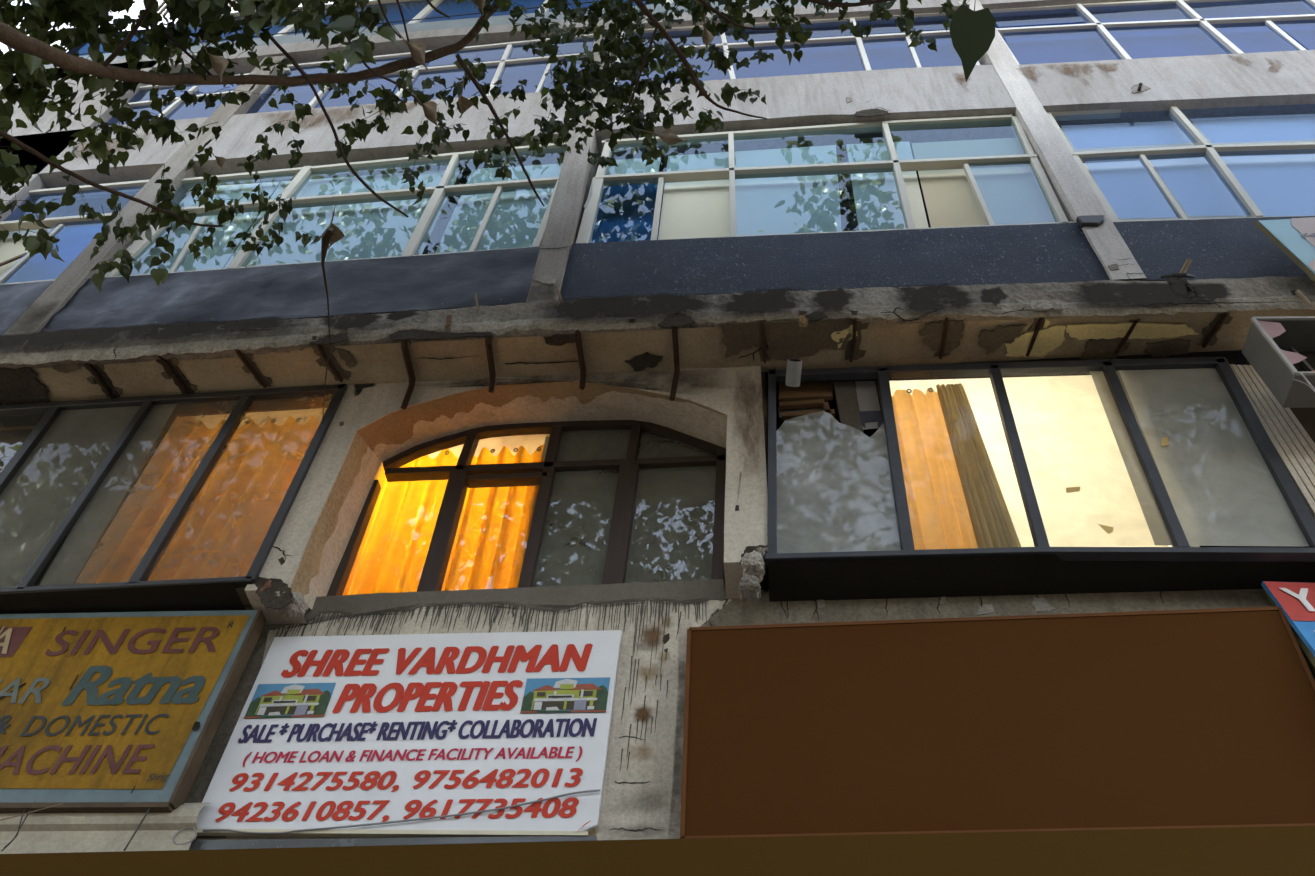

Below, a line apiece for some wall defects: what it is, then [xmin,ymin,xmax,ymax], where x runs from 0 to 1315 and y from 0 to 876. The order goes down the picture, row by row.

spalling [309,332,356,382]
spalling [389,329,490,341]
peeling [543,333,576,346]
peeling [625,352,663,372]
peeling [721,311,869,363]
peeling [919,317,965,359]
peeling [978,300,1233,360]
peeling [253,381,725,617]
spalling [739,545,768,603]
rust [643,627,661,645]
leakage [276,599,728,796]
rust [635,706,650,721]